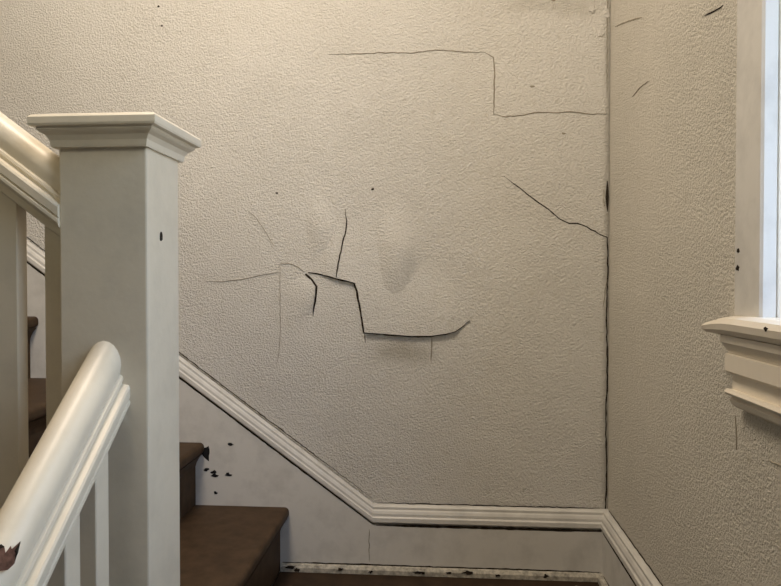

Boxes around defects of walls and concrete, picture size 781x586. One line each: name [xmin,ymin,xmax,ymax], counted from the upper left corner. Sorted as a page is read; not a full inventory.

crack [336,49,601,117]
crack [27,237,45,276]
crack [179,176,663,586]